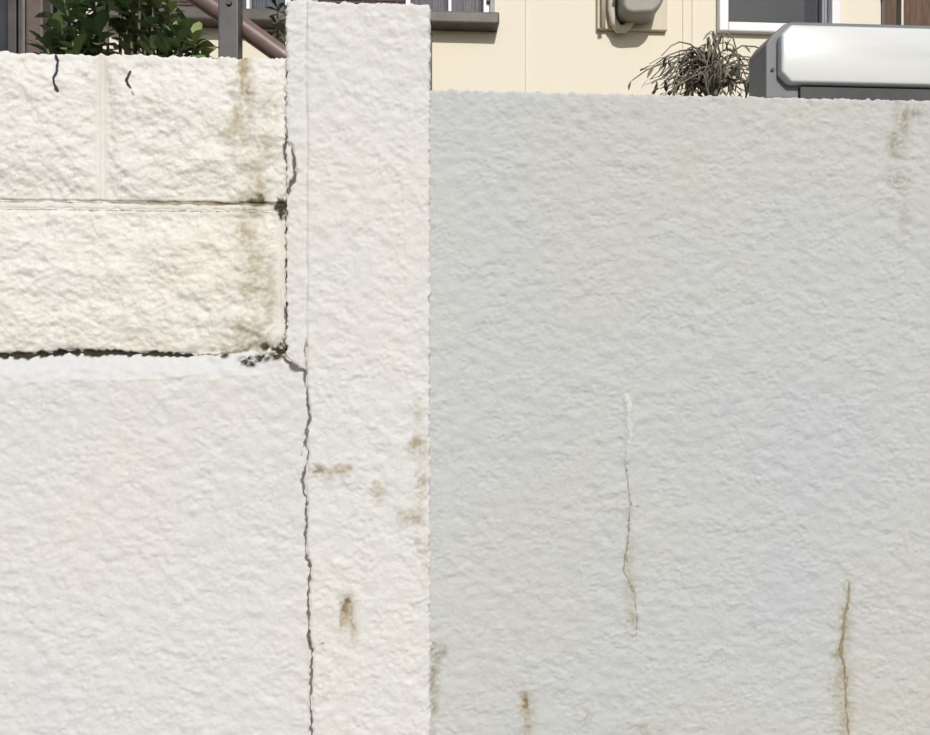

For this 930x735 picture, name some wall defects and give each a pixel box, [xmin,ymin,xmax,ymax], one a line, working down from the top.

crack [51,54,59,92]
crack [125,70,134,95]
crack [283,128,297,234]
crack [0,348,249,360]
crack [281,258,324,735]
crack [623,466,639,634]
crack [839,581,851,735]